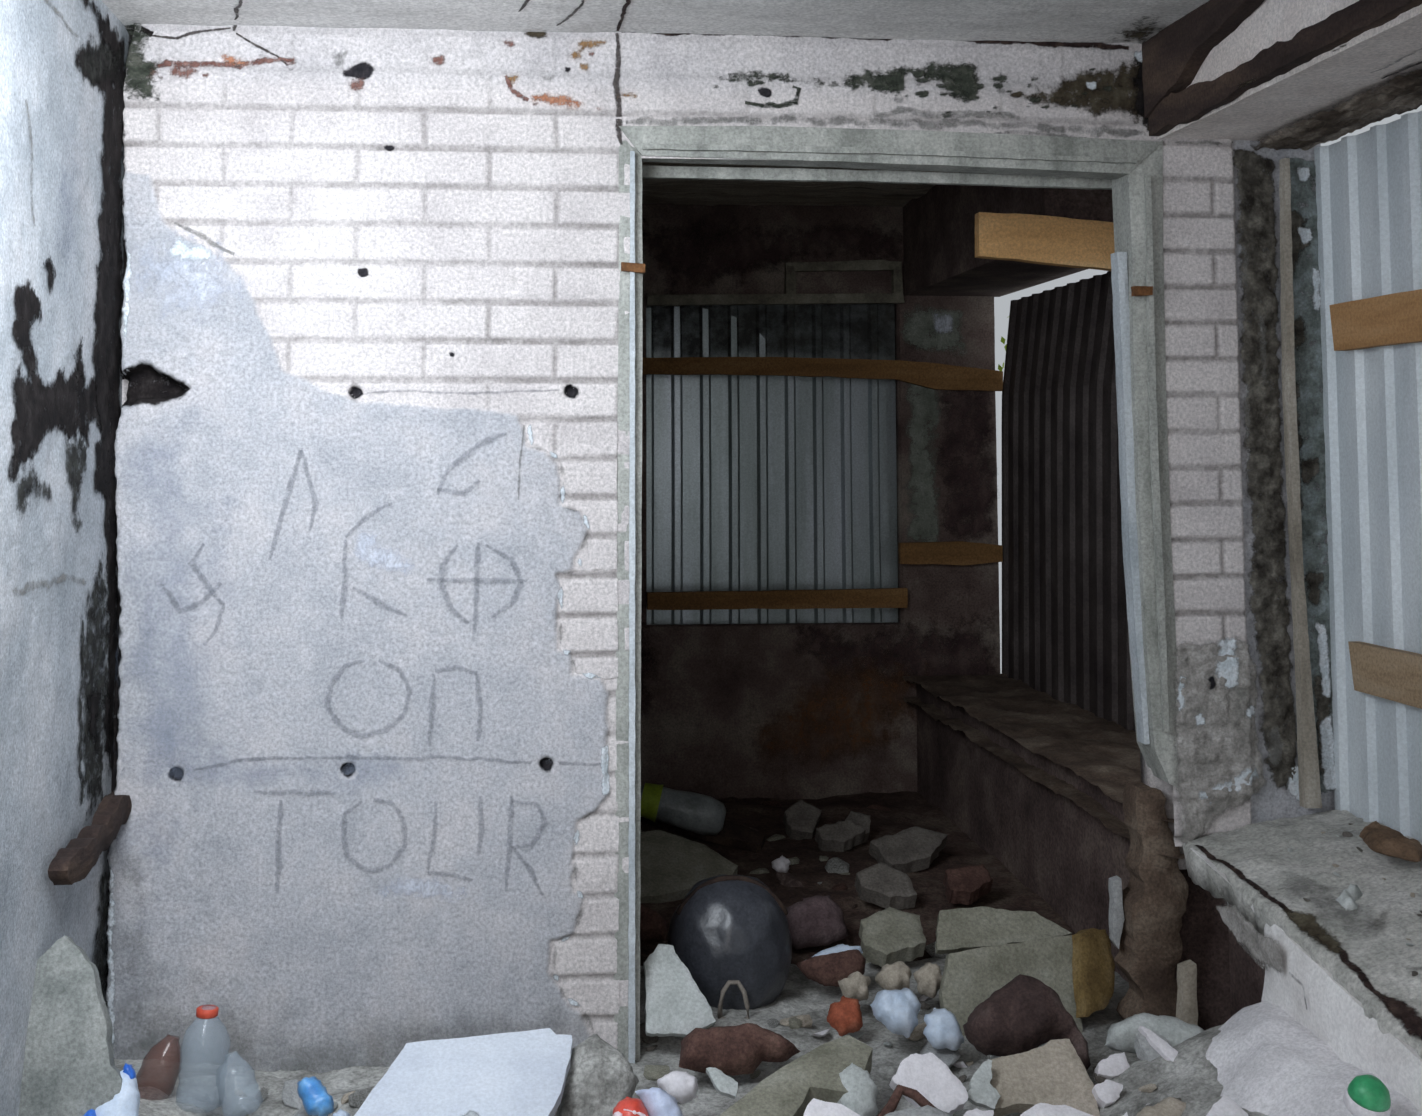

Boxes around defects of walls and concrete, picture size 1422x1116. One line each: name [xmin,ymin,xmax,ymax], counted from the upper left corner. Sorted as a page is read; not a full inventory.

rust [140,55,295,78]
spalling [336,55,374,90]
rust [505,75,580,107]
rust [565,40,605,72]
crack [613,0,891,145]
water stain [714,51,1149,134]
crack [961,40,1129,50]
spalling [121,362,190,406]
spalling [1175,62,1422,844]
spalling [528,419,618,679]
water stain [78,621,112,805]
crack [1195,845,1422,1040]